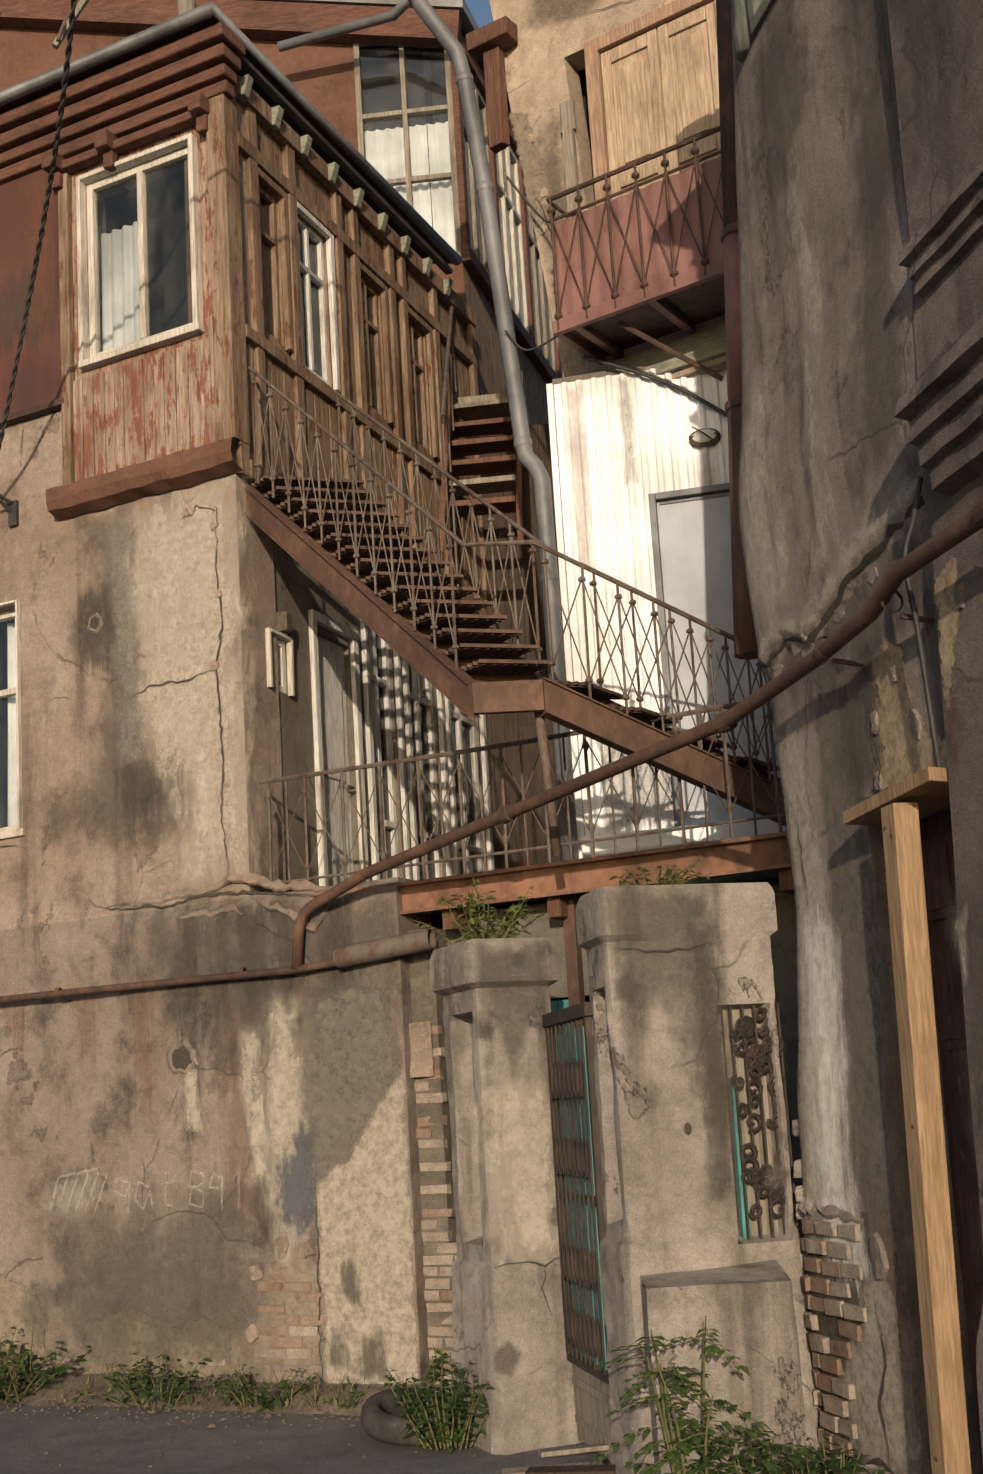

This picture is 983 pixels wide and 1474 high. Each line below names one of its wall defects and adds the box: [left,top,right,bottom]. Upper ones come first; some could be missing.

leakage [52,519,208,834]
crack [105,504,319,963]
peeling [870,636,947,791]
peeling [934,557,965,709]
peeling [175,871,333,932]
leakage [152,899,389,1256]
flaking render [82,1235,327,1379]
flaking render [792,1113,889,1471]
crack [867,1305,895,1474]